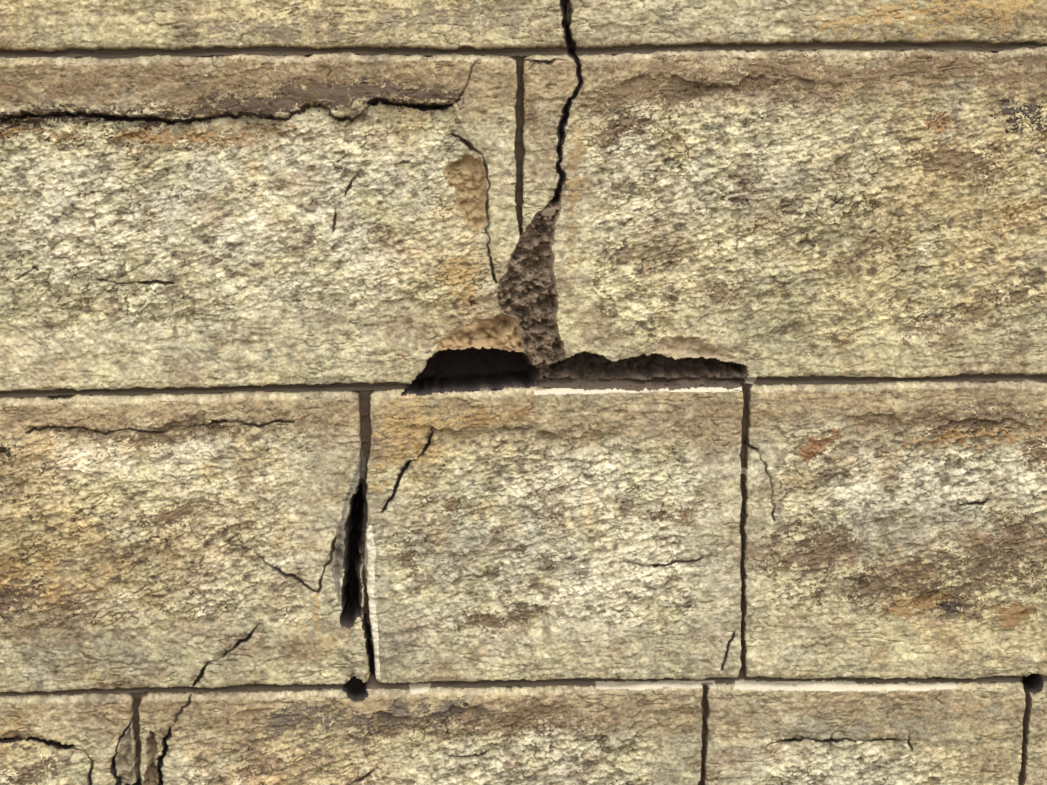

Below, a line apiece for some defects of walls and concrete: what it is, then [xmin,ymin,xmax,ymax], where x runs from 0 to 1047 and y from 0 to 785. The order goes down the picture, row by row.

crack [0,60,478,125]
crack [528,0,583,199]
crack [333,175,357,231]
crack [452,134,496,282]
crack [99,278,172,286]
peeling [401,194,749,396]
crack [28,419,293,435]
crack [382,429,433,511]
crack [258,538,336,592]
crack [362,615,375,673]
crack [157,628,256,785]
crack [0,723,131,785]